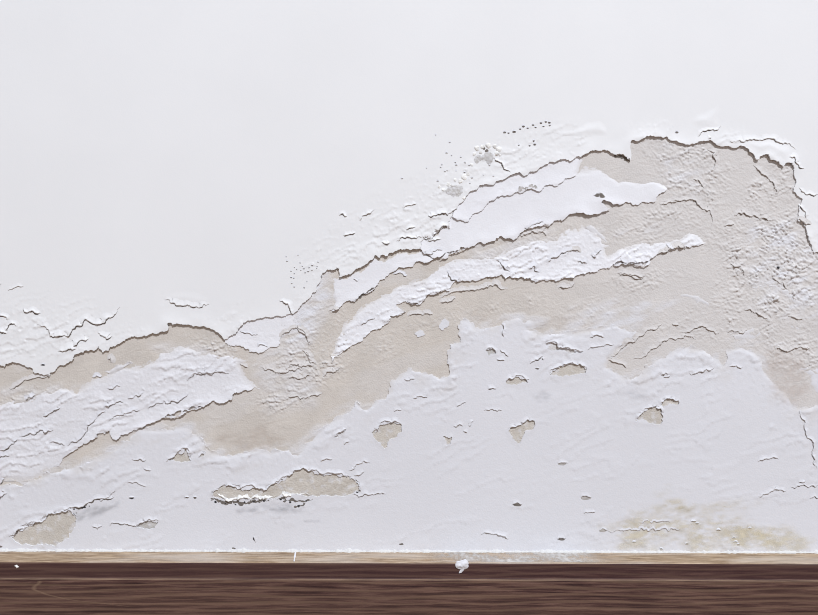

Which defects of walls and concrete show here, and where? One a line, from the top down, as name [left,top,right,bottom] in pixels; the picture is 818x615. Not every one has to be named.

flaking render [0,130,818,485]
flaking render [211,465,362,508]
flaking render [9,508,77,546]
flaking render [135,515,159,529]